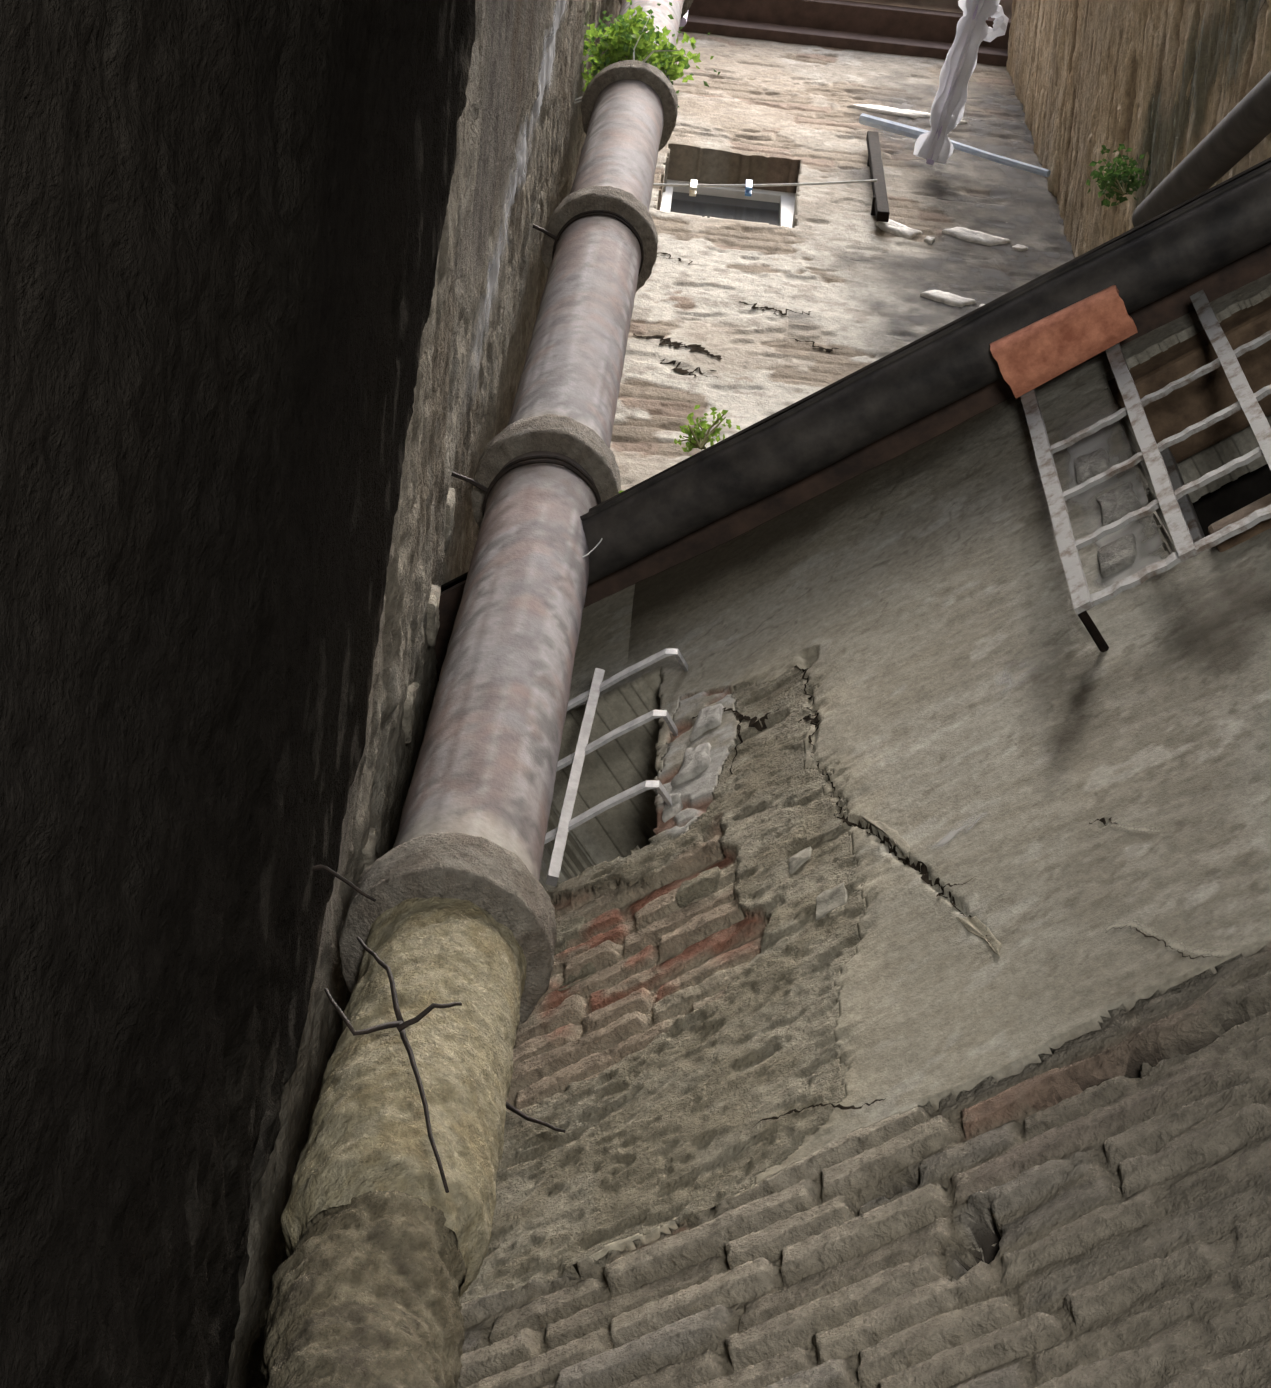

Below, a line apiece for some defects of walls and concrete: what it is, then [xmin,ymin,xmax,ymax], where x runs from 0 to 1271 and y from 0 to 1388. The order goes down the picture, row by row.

flaking render [444,488,456,552]
flaking render [425,584,441,647]
flaking render [402,682,420,743]
crack [692,665,1002,956]
flaking render [362,827,380,871]
flaking render [460,666,867,1304]
spalling [1125,1063,1156,1078]
spalling [969,1223,1001,1270]
flaking render [241,1283,272,1388]